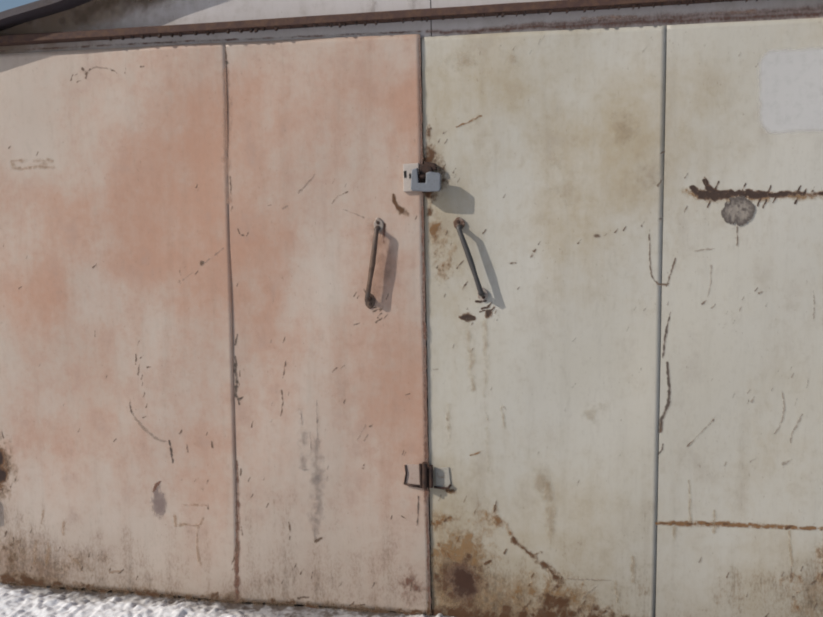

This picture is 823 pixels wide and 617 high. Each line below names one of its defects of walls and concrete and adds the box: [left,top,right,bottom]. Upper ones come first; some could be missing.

rust [684,176,823,208]
rust [392,82,459,421]
peeling [0,448,16,490]
rust [0,461,257,604]
rust [271,514,628,617]
rust [655,520,823,530]